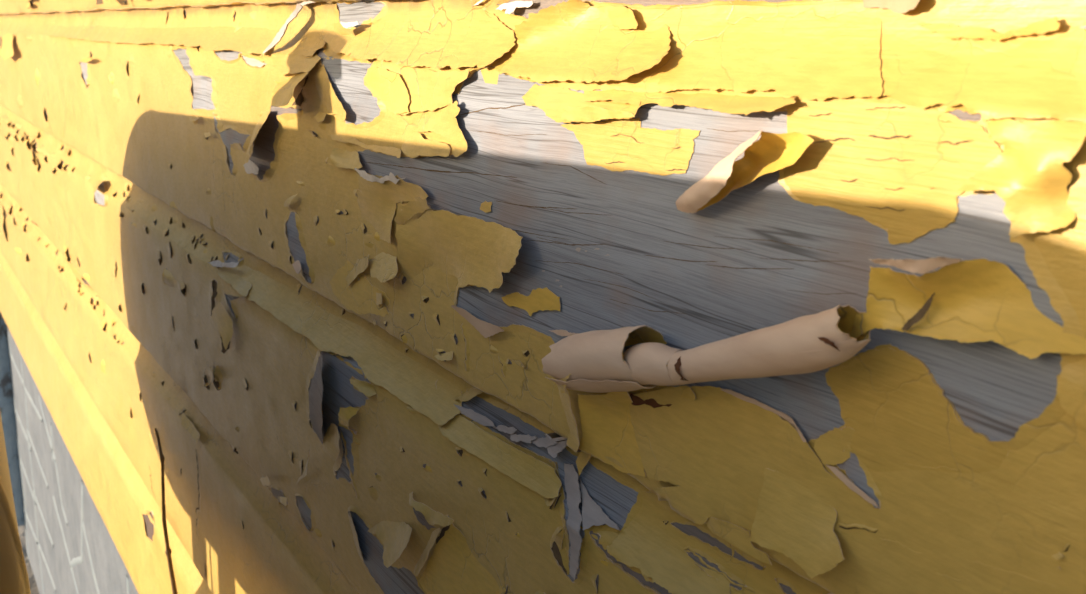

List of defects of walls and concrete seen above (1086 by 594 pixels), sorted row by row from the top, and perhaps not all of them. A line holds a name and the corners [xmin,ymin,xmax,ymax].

peeling [4,121,76,174]
peeling [93,176,134,217]
peeling [0,192,136,345]
peeling [142,216,216,296]
peeling [208,0,1086,579]
peeling [202,365,223,391]
crack [181,412,203,538]